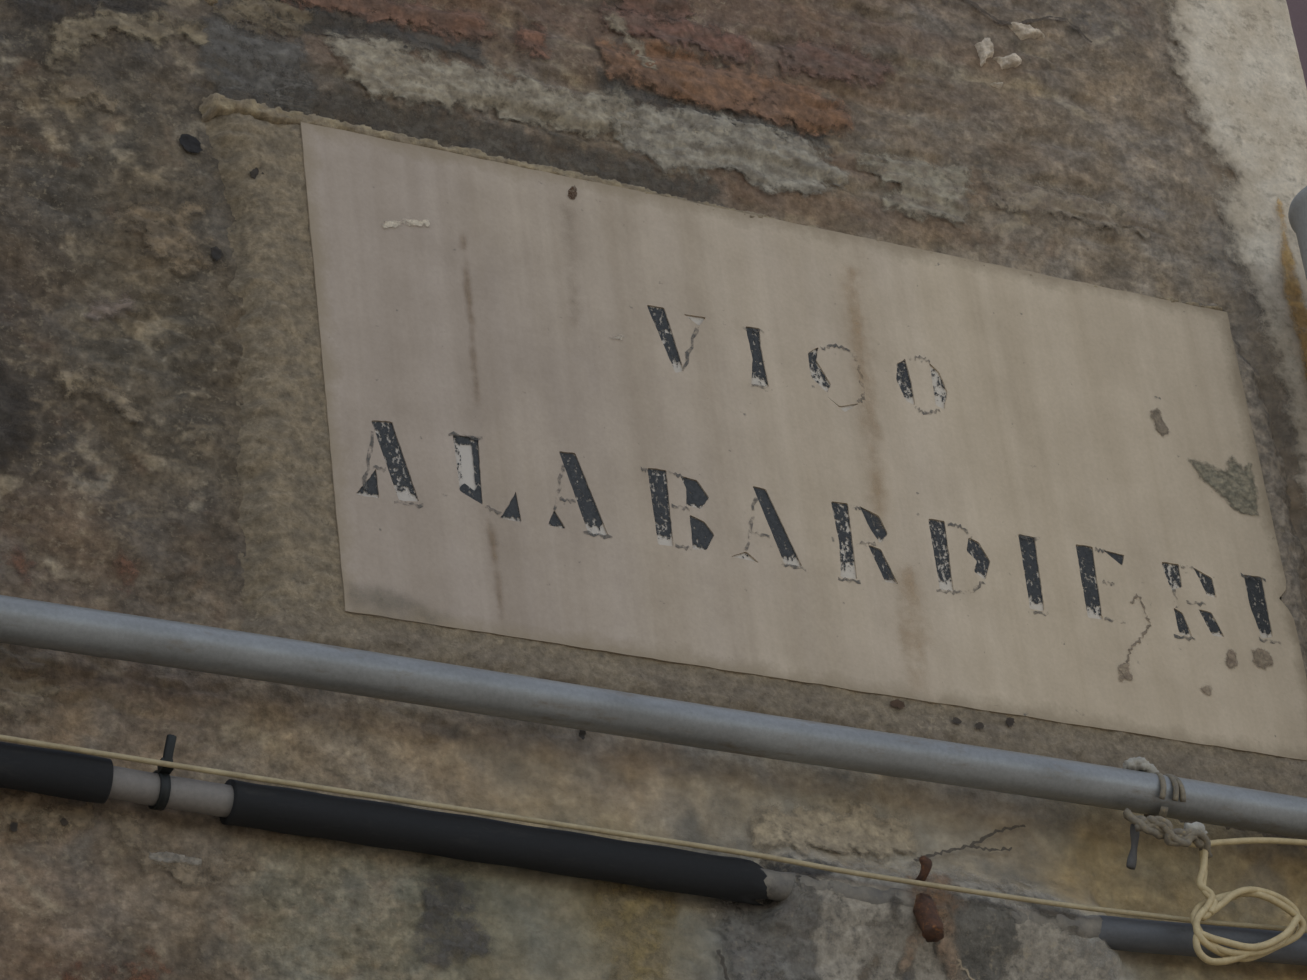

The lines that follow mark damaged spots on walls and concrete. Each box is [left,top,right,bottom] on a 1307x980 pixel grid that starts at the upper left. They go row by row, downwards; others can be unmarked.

spalling [262,0,497,65]
spalling [594,0,895,151]
spalling [1189,457,1259,515]
crack [914,825,1025,861]
peeling [711,854,1118,980]
rust [908,876,960,980]